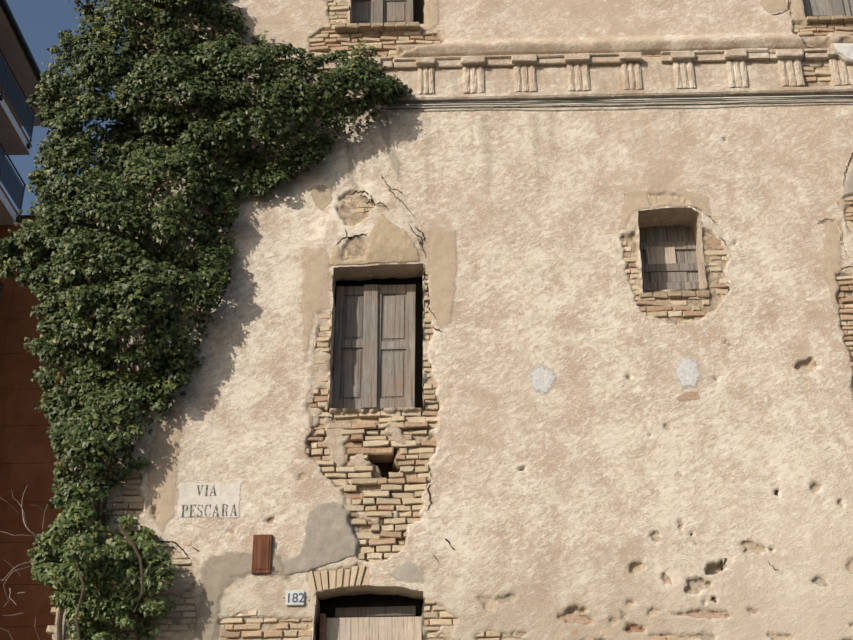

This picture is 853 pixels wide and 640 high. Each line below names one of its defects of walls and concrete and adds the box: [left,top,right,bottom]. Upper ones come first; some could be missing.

flaking render [309,0,442,59]
crack [337,229,366,244]
crack [348,176,441,332]
flaking render [604,230,717,325]
flaking render [836,275,853,368]
flaking render [306,271,452,592]
spalling [741,540,772,554]
flaking render [92,540,196,640]
flaking render [217,610,313,640]
flaking render [423,598,458,640]
spalling [558,600,714,640]
spalling [677,564,730,619]